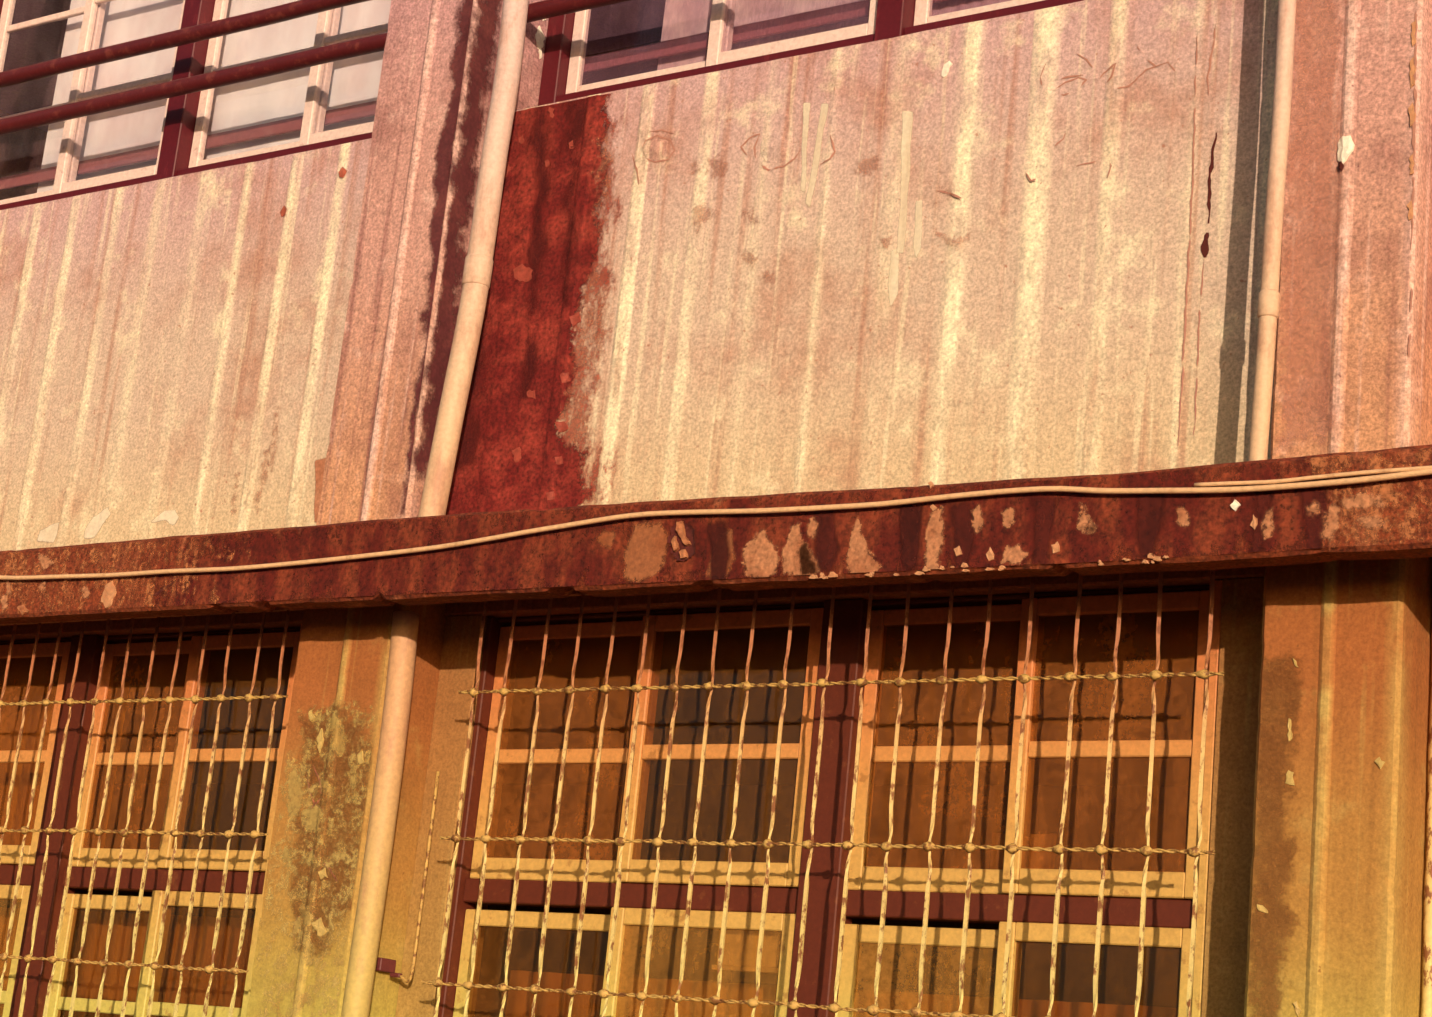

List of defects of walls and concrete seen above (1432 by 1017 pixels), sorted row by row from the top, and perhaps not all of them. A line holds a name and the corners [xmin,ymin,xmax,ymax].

peeling [535,19,546,59]
peeling [1337,135,1355,171]
crack [1040,26,1217,444]
water stain [143,0,1344,606]
peeling [707,481,1028,579]
peeling [1077,504,1096,534]
peeling [1177,507,1189,526]
peeling [1230,500,1274,540]
peeling [1122,553,1169,564]
peeling [258,703,374,1017]